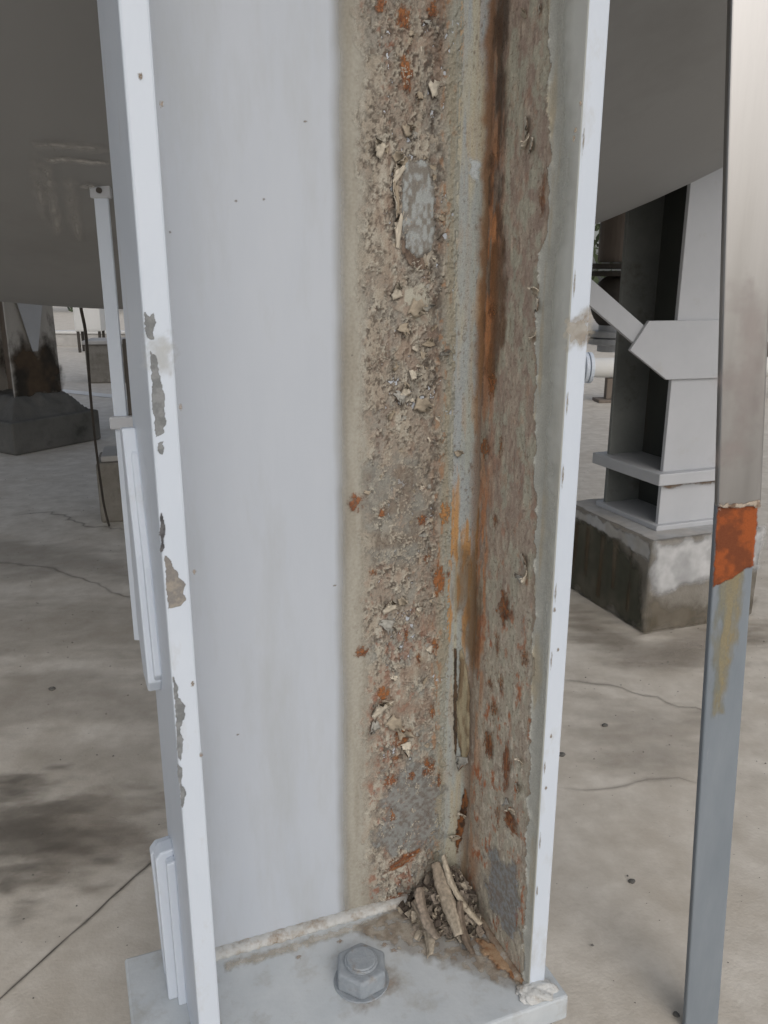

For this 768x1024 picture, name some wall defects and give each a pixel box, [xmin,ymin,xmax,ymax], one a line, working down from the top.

peeling [144,312,166,454]
peeling [159,513,196,608]
peeling [349,0,470,905]
corrosion [383,0,552,984]
peeling [485,0,585,983]
corrosion [713,506,758,712]
water stain [0,776,71,855]
peeling [173,677,186,807]